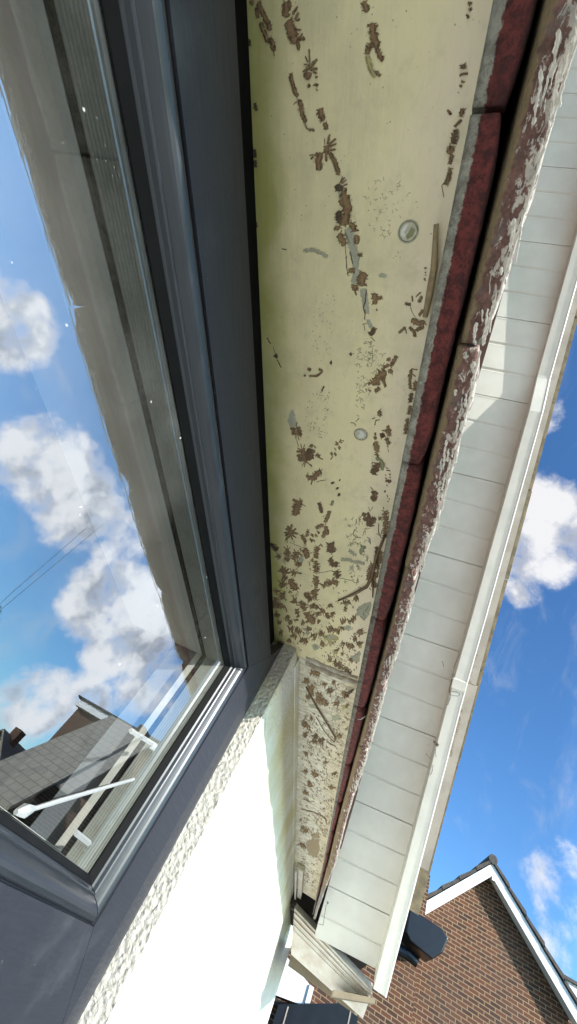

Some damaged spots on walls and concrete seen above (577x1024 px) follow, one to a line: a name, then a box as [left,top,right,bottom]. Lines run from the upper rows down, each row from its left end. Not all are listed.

peeling [342,537,371,583]
peeling [304,602,371,674]
peeling [298,826,320,858]